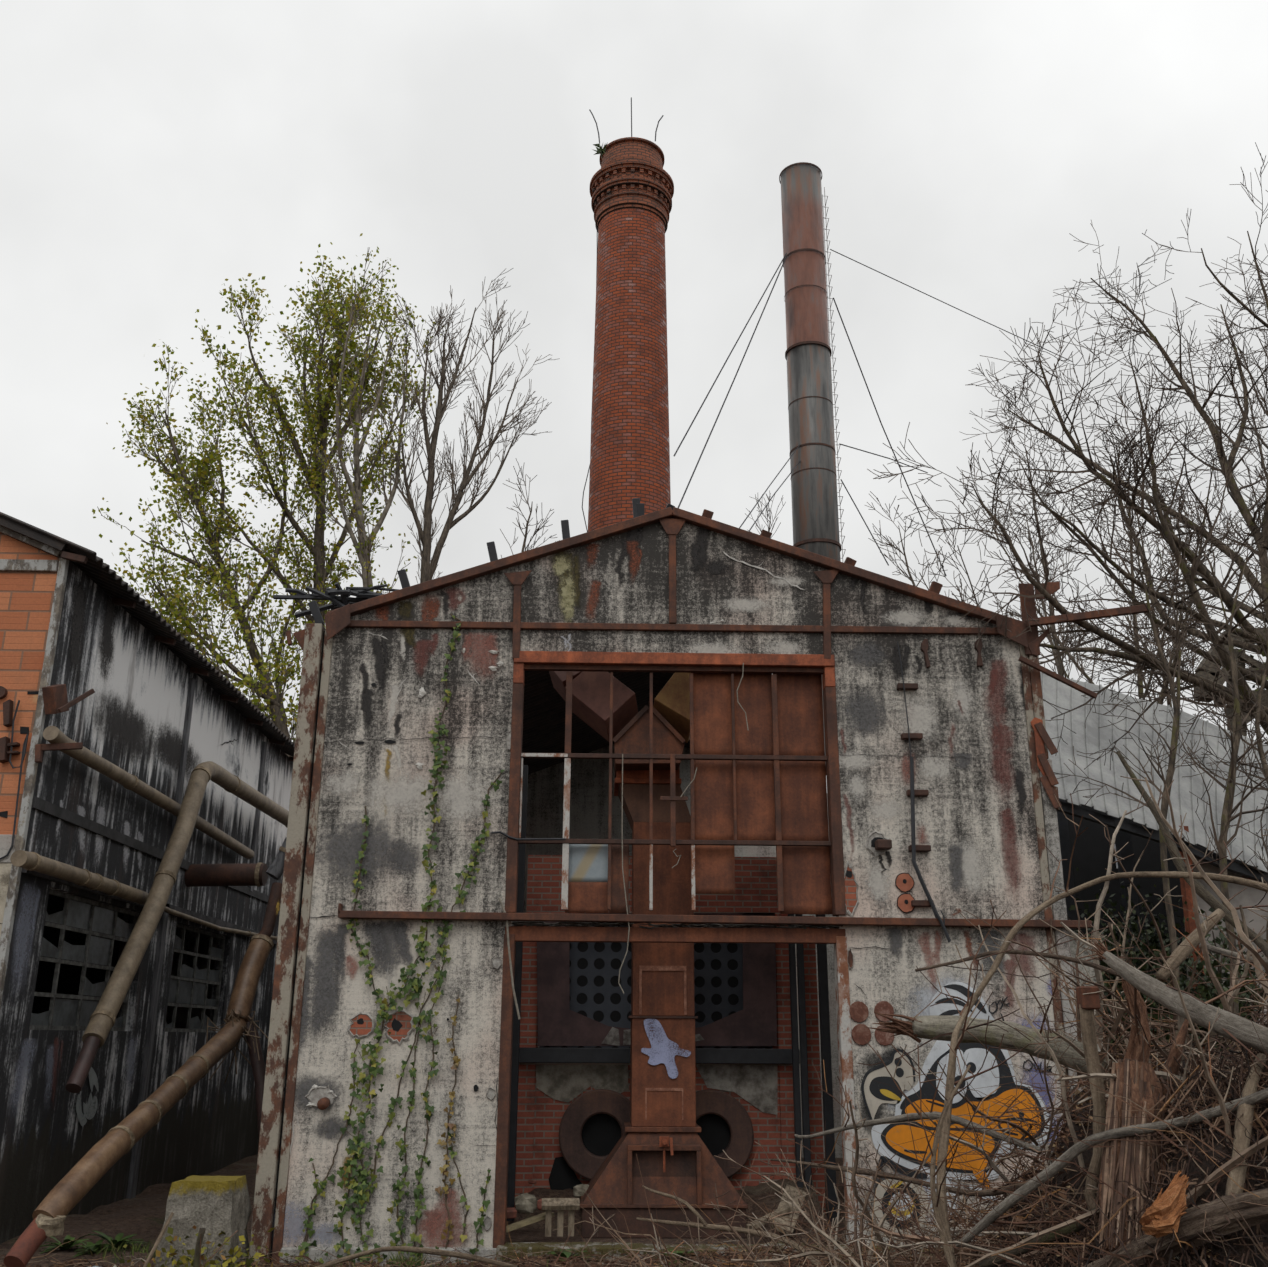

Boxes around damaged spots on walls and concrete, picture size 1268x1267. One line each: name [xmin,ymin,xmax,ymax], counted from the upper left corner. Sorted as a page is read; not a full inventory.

leakage [99,596,117,676]
rust [988,661,1013,789]
rust [844,796,854,844]
rust [1002,809,1021,887]
leakage [299,924,348,1047]
leakage [365,920,413,974]